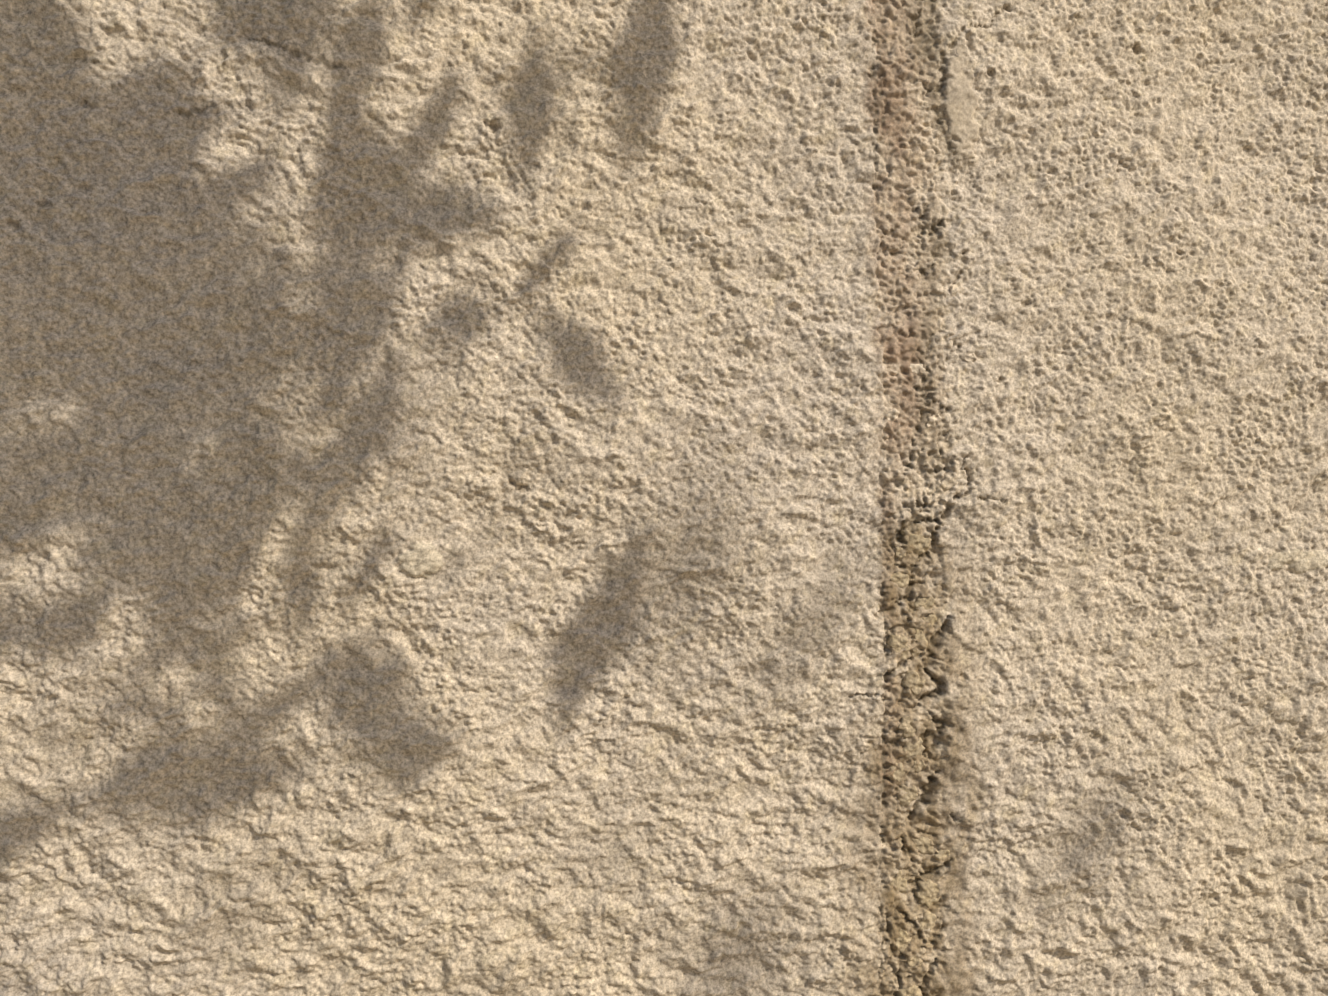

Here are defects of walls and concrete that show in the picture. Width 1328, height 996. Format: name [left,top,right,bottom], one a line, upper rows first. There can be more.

crack [881,493,981,598]
crack [879,624,946,882]